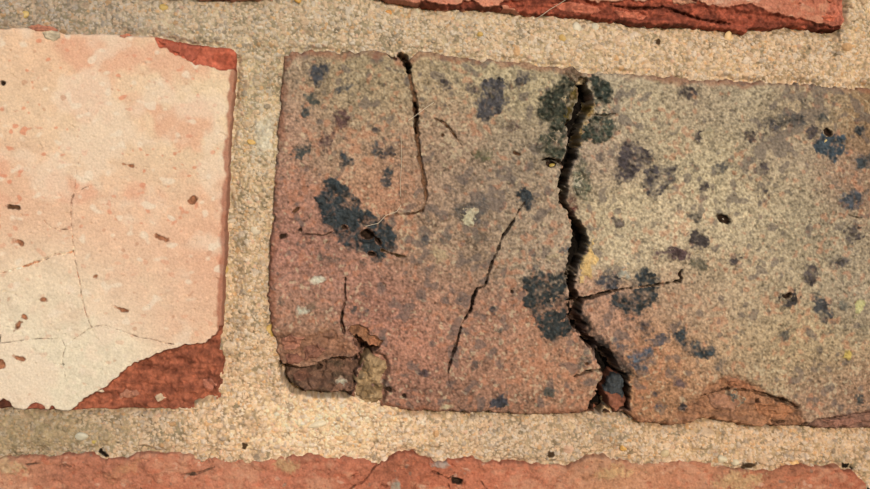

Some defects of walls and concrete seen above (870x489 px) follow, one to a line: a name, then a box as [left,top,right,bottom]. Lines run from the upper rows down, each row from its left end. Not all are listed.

spalling [418,0,844,36]
crack [384,53,463,218]
crack [304,230,333,238]
crack [380,248,406,258]
crack [541,77,683,412]
crack [447,202,525,388]
spalling [25,325,226,411]
spalling [271,319,383,395]
spalling [669,371,870,429]